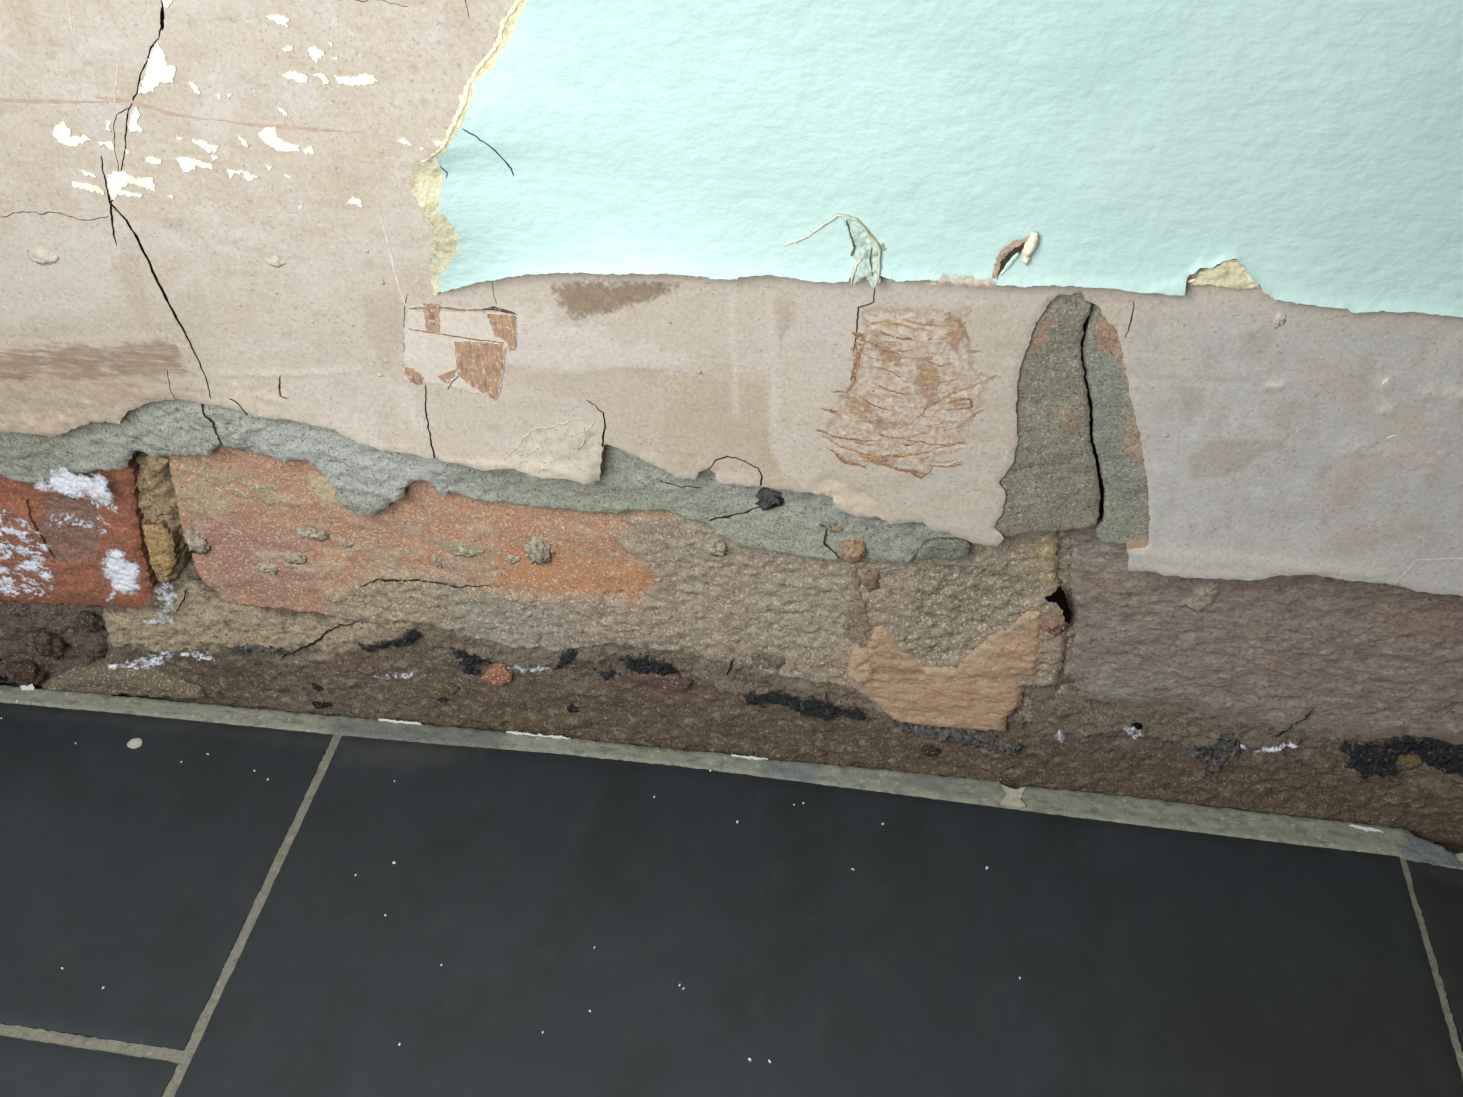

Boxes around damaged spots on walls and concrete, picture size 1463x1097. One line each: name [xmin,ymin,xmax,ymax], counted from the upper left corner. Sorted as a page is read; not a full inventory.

peeling [52,42,315,200]
peeling [266,14,290,27]
peeling [281,42,378,86]
crack [1,0,248,446]
leakage [0,466,176,624]
peeling [423,303,440,333]
peeling [404,314,517,400]
flaking render [0,399,972,563]
spalling [1045,586,1071,623]
spalling [995,292,1148,545]
crack [1081,303,1104,521]
crack [1125,302,1135,337]